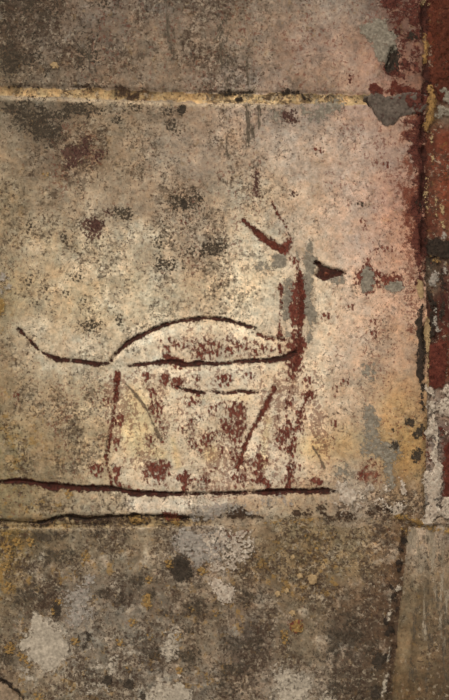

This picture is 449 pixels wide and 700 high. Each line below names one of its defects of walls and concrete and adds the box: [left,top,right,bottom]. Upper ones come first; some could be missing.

crack [0,512,195,530]
crack [218,505,264,520]